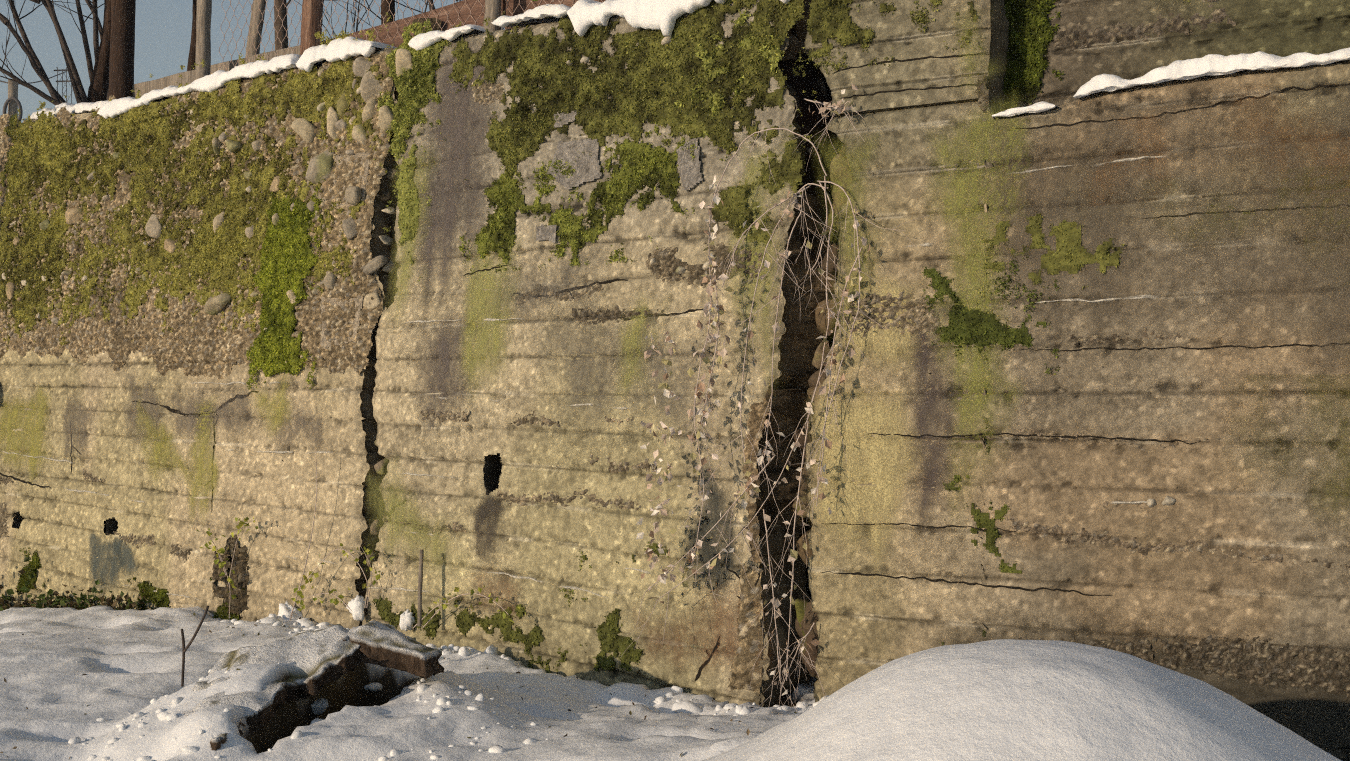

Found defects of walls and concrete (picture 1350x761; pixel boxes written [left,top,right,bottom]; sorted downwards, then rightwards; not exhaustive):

crack [412,18,441,36]
crack [379,168,400,282]
leakage [397,58,486,295]
leakage [409,254,567,413]
crack [695,19,1110,706]
leakage [90,534,135,586]
crack [132,390,258,512]
crack [366,440,407,568]